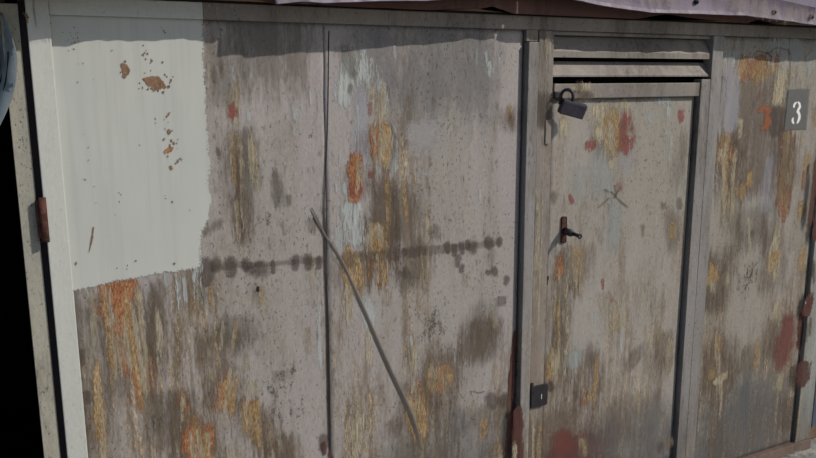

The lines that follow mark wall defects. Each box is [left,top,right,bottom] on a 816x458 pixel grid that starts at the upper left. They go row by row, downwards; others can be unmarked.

rust [139,45,173,94]
rust [163,112,181,170]
rust [340,80,408,328]
rust [445,237,502,256]
rust [715,46,816,280]
rust [92,260,165,458]
rust [491,331,517,458]
rust [542,240,600,416]
rust [772,290,814,393]